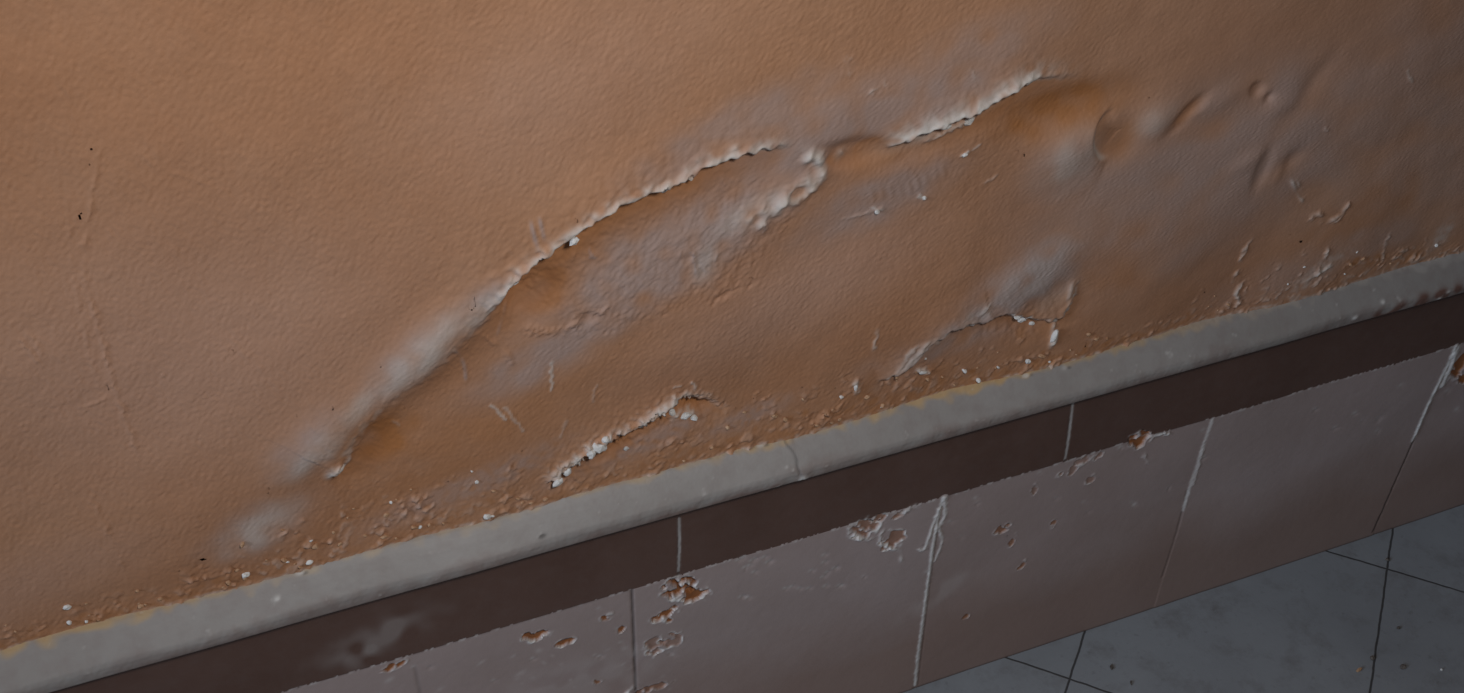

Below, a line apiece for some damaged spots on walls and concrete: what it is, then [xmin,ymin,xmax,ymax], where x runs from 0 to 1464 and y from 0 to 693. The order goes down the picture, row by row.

flaking render [456,59,1132,383]
spalling [376,657,410,676]
flaking render [0,229,1464,658]
crack [912,494,949,687]